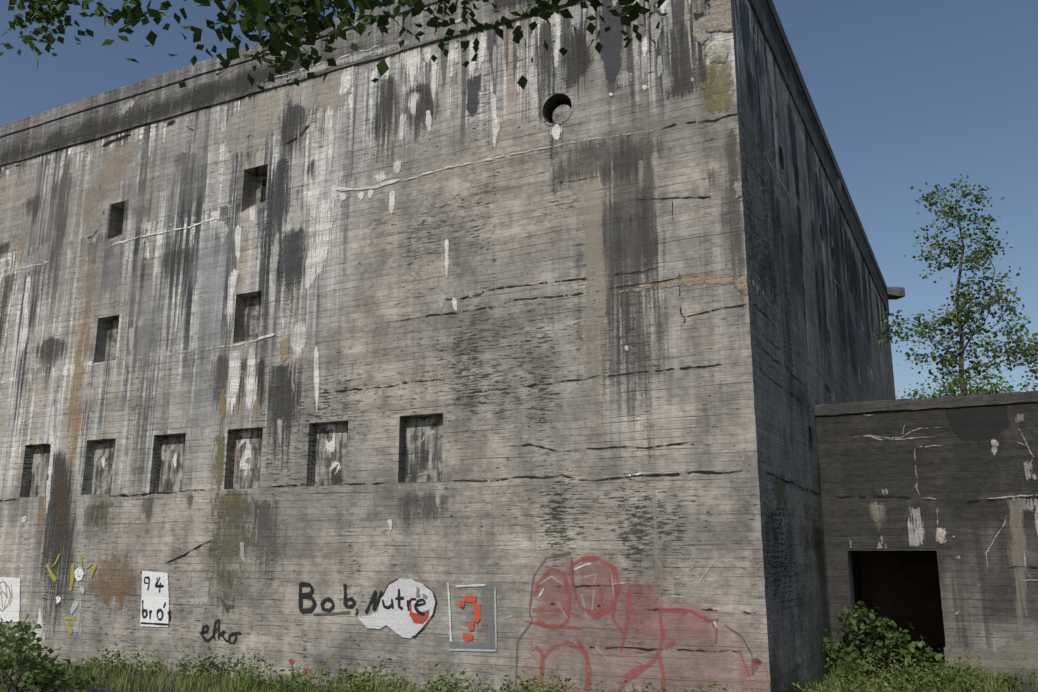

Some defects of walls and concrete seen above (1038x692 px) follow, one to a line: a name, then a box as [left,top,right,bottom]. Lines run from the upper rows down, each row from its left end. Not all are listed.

water stain [0,0,889,474]
corrosion [68,247,96,493]
water stain [945,404,1024,443]
water stain [143,497,153,518]
water stain [212,429,255,508]
water stain [240,500,283,575]
water stain [388,492,444,531]
crack [453,414,941,526]
water stain [908,507,925,546]
crack [963,494,1038,581]